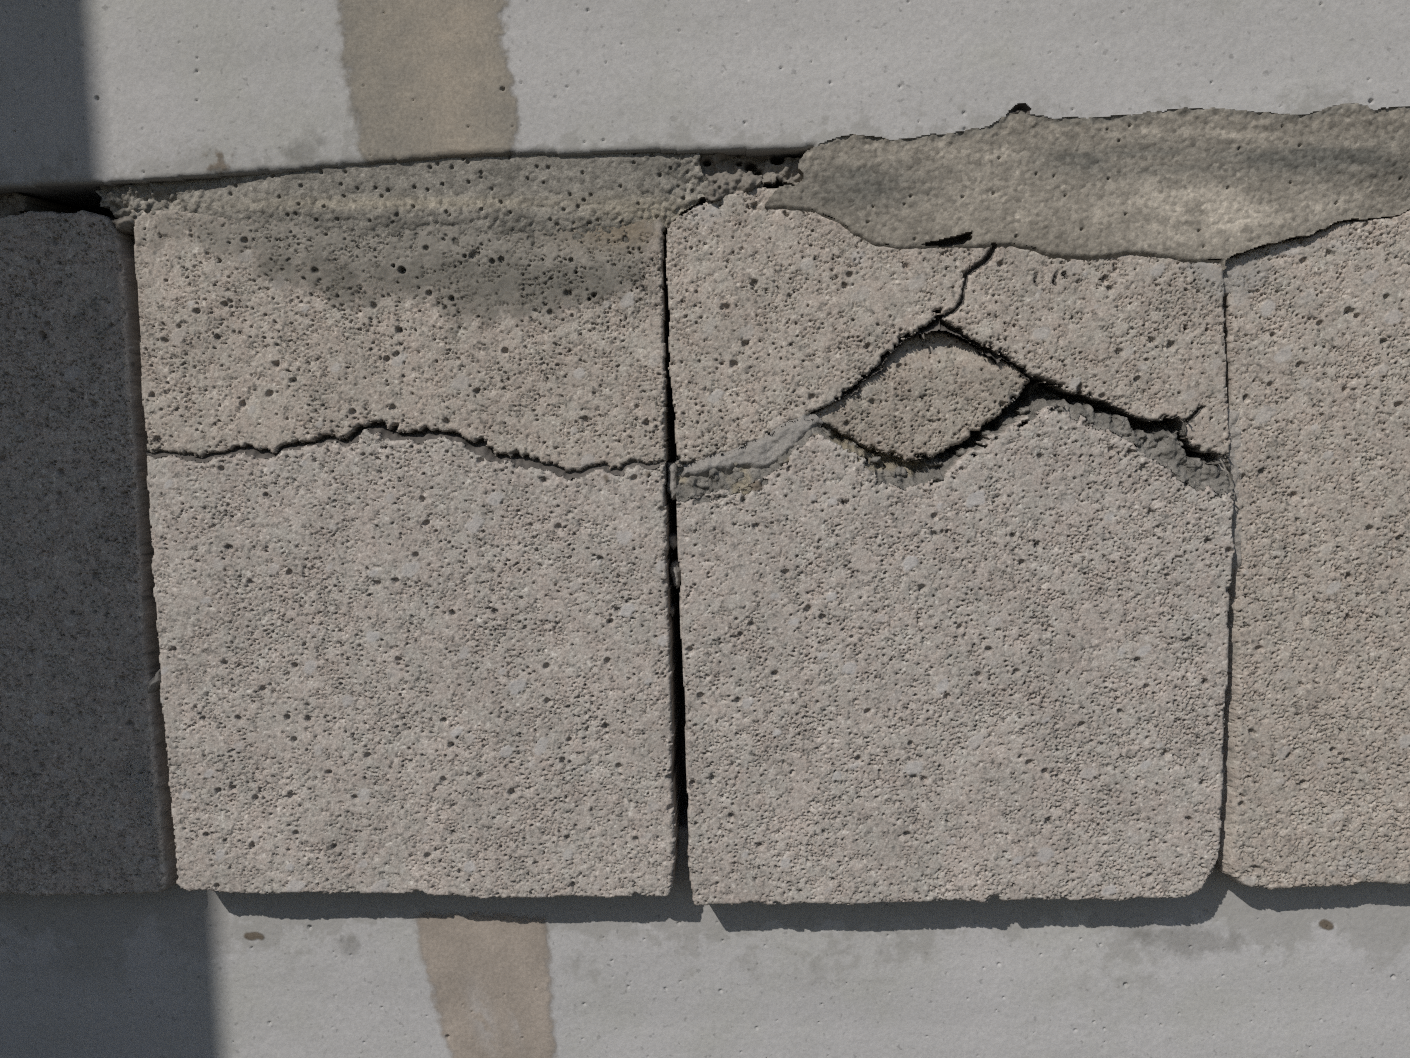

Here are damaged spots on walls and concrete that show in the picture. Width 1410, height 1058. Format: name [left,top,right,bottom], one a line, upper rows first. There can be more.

spalling [1007,103,1031,114]
damp [184,217,657,318]
peeling [924,233,971,247]
crack [1034,272,1068,287]
crack [810,243,1036,414]
crack [146,420,666,480]
spalling [675,377,1235,508]
crack [1183,407,1205,424]